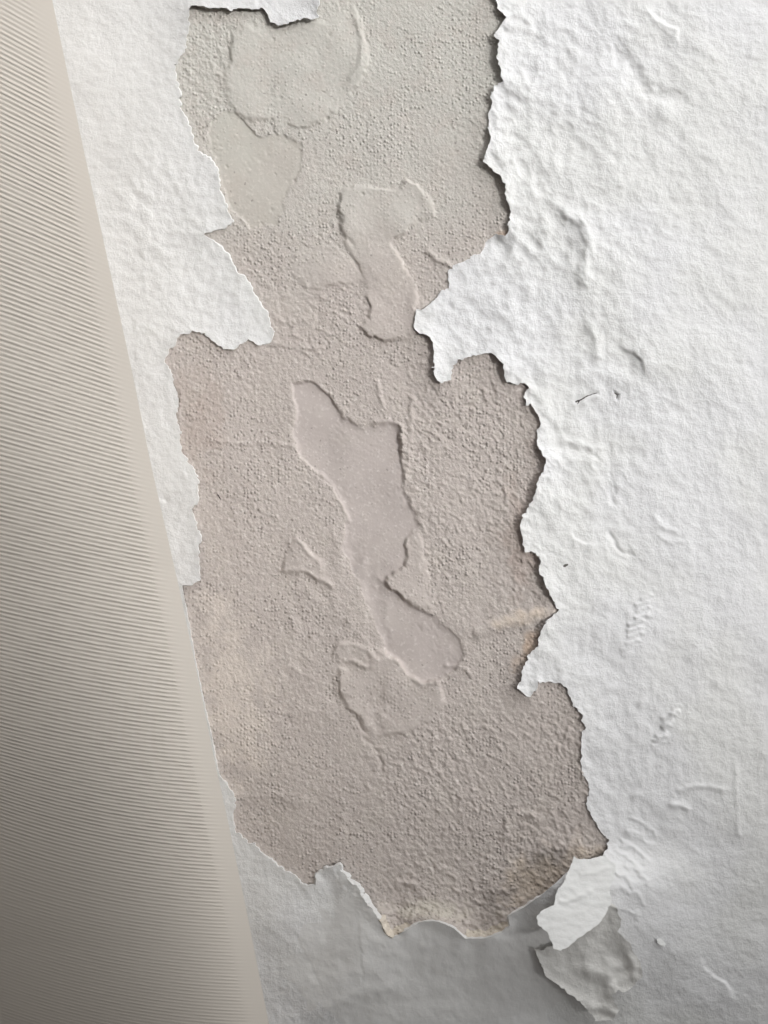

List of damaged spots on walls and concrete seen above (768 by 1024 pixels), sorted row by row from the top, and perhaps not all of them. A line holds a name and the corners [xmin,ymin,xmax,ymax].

peeling [140,0,643,1021]